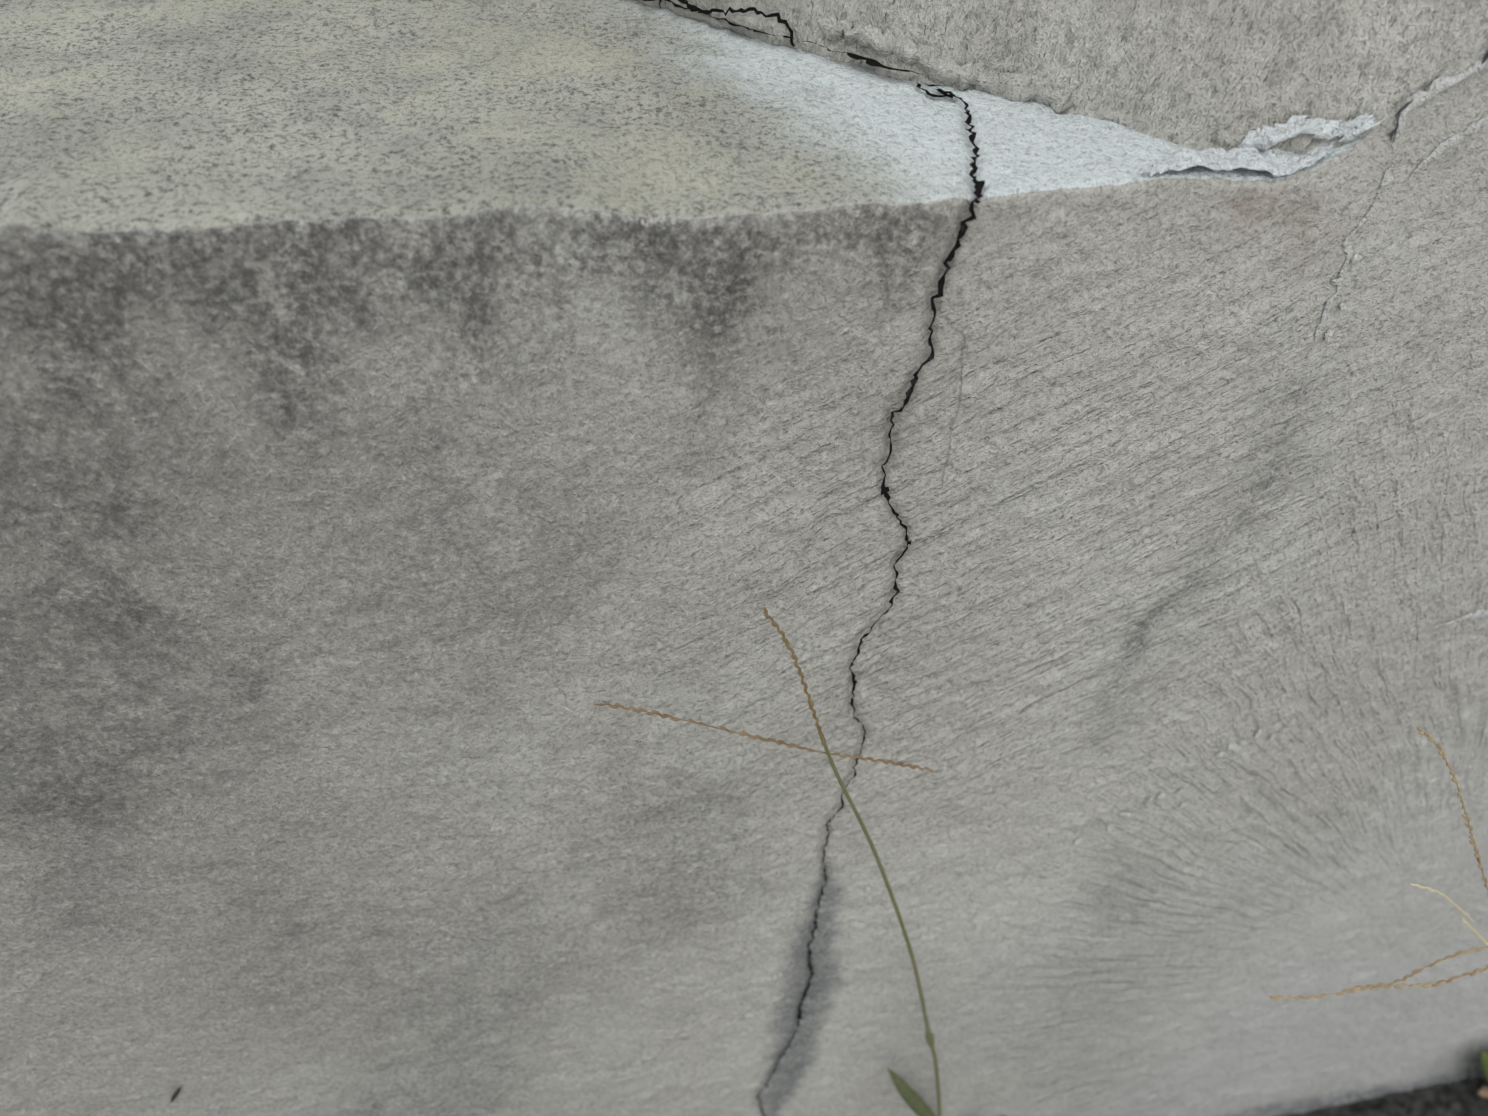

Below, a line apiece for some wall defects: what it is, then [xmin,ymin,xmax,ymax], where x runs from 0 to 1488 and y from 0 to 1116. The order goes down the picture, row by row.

crack [620,0,985,1116]
crack [1390,49,1488,142]